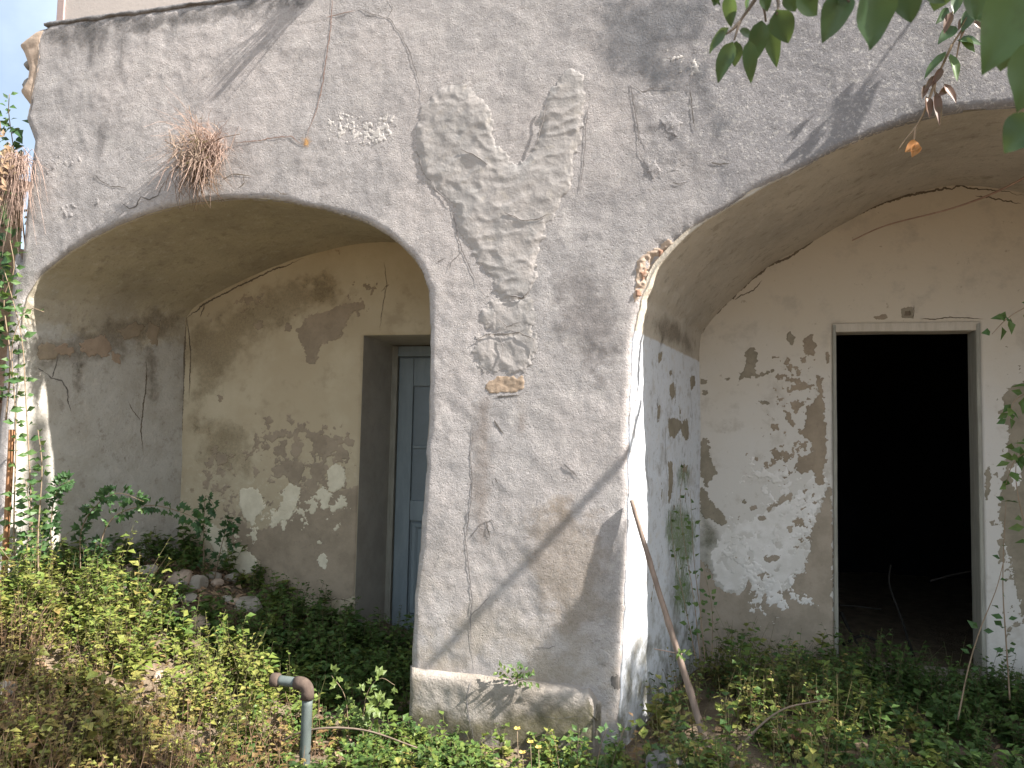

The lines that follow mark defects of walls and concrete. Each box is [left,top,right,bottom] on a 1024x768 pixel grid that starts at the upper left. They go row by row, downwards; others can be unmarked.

crack [239,2,421,144]
peeling [328,113,401,151]
crack [860,185,1022,215]
crack [38,358,71,410]
crack [182,258,303,430]
peeling [283,282,389,364]
flaking render [485,375,525,398]
spalling [633,239,673,302]
crack [703,242,812,332]
peeling [200,414,358,600]
crack [465,420,504,660]
peeling [657,331,834,672]